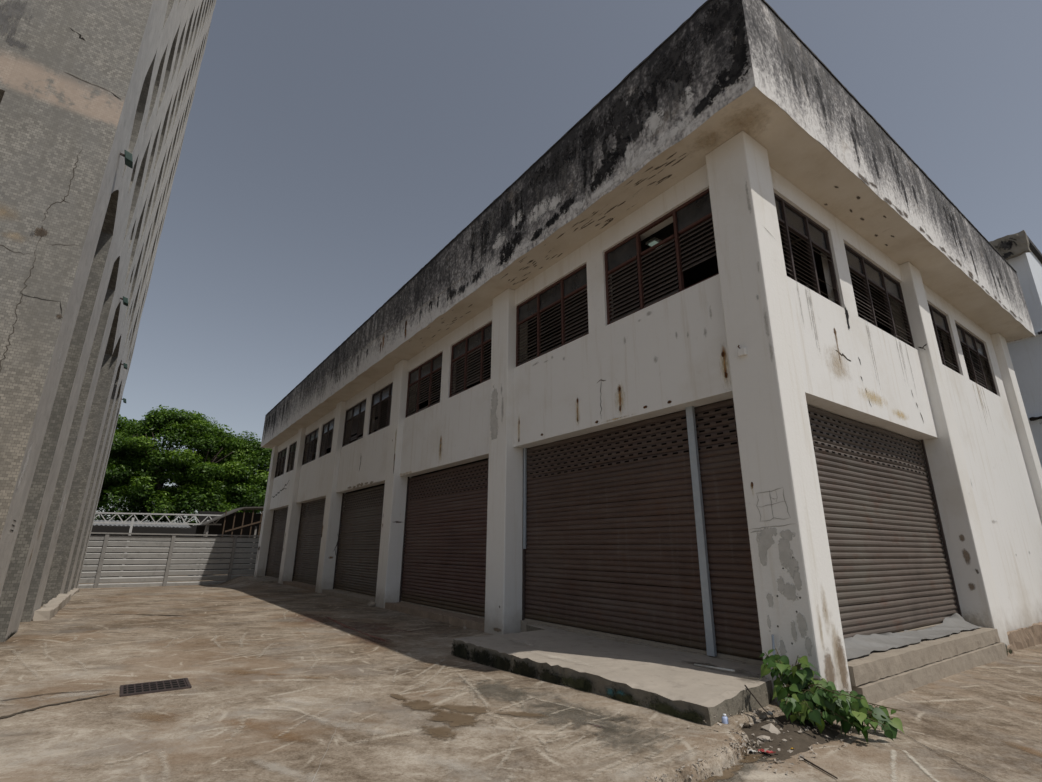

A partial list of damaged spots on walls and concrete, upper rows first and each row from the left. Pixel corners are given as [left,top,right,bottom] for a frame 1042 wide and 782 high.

crack [0,148,83,372]
water stain [419,0,751,323]
peeling [756,527,811,656]